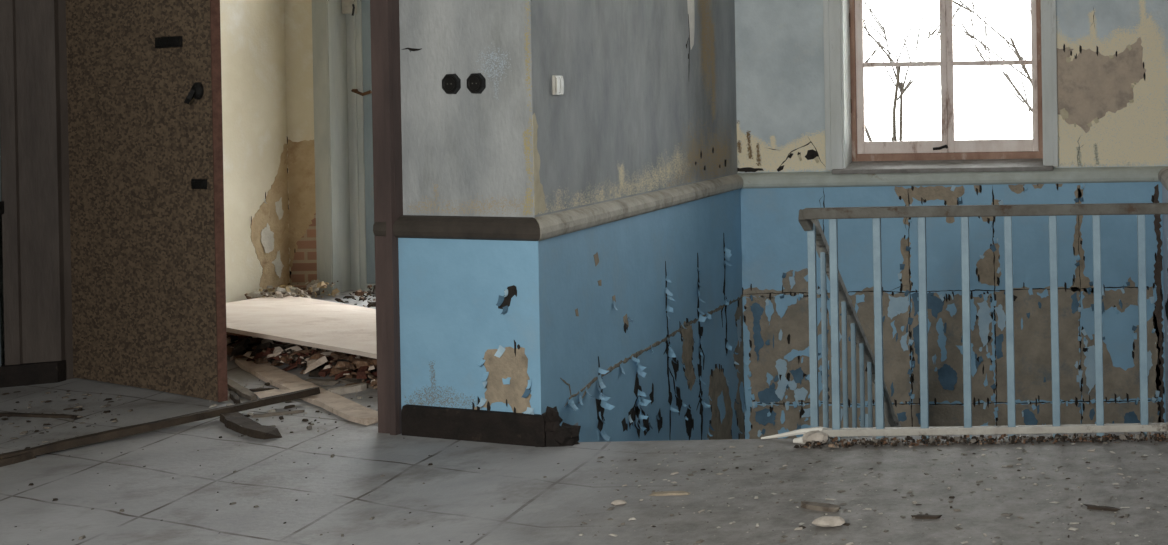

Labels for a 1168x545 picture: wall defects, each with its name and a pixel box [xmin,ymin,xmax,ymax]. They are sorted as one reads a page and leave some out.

peeling [695,122,830,172]
flaking render [251,137,317,292]
peeling [496,285,517,315]
peeling [671,183,1168,444]
peeling [472,340,534,415]
peeling [622,383,663,435]